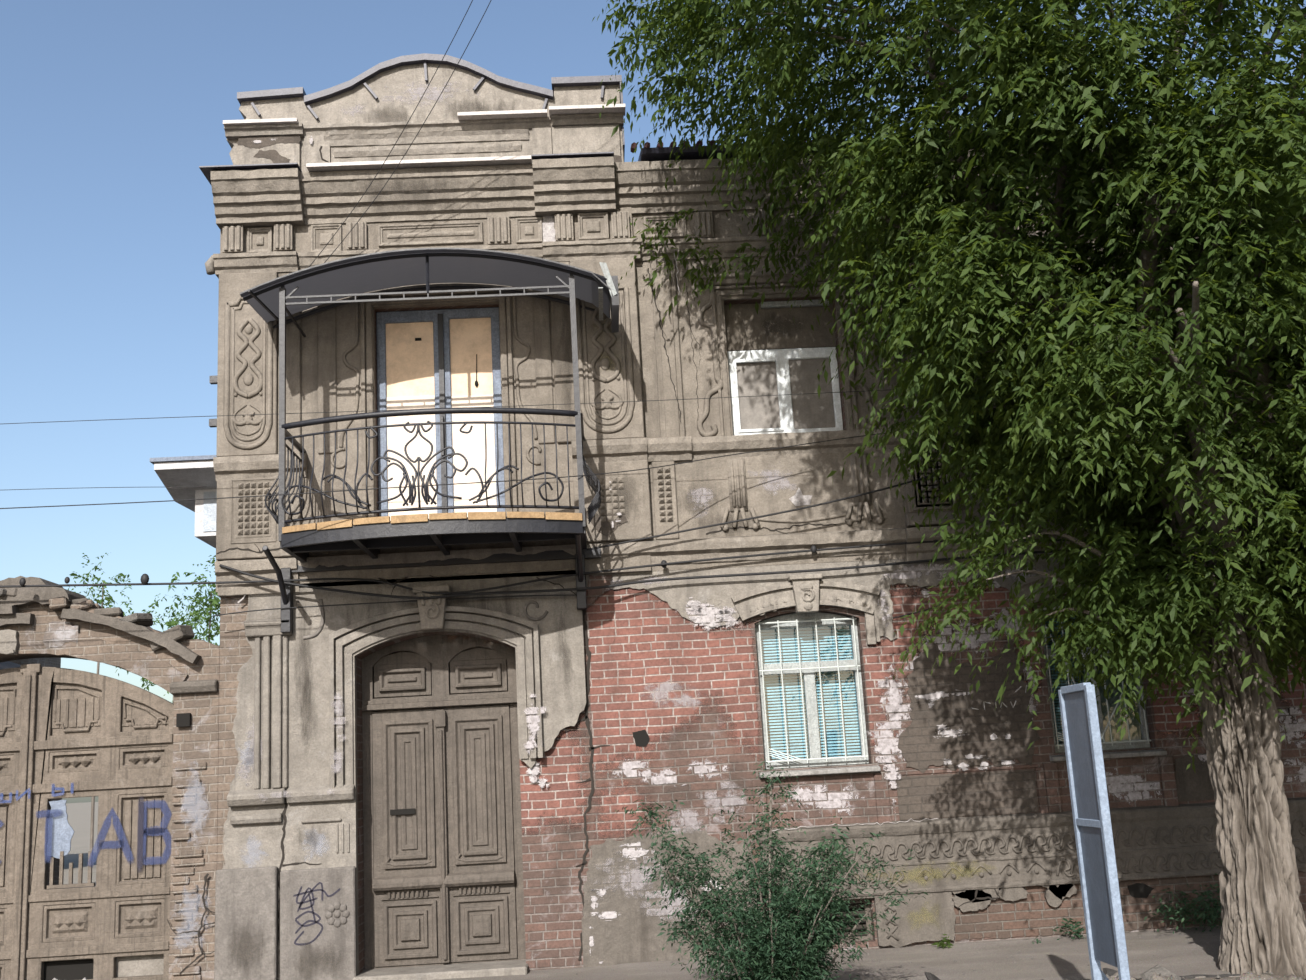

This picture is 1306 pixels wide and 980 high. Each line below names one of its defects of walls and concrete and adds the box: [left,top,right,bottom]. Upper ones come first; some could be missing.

crack [278,800,322,974]
crack [536,577,610,960]
spalling [520,575,759,967]
peeling [863,580,1042,820]
spalling [952,884,1086,941]
spalling [1119,876,1222,932]